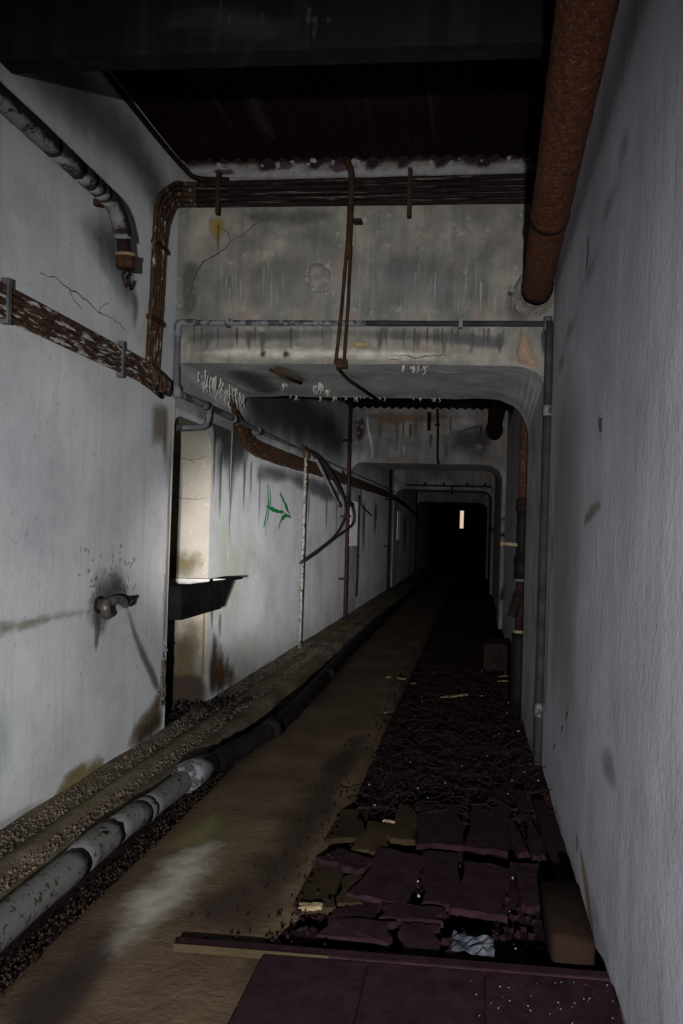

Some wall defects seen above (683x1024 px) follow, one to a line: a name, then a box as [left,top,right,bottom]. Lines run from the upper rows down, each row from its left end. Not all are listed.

crack [182,214,264,300]
crack [41,273,125,329]
water stain [206,333,429,375]
water stain [197,370,297,410]
water stain [211,423,338,505]
water stain [94,576,126,646]